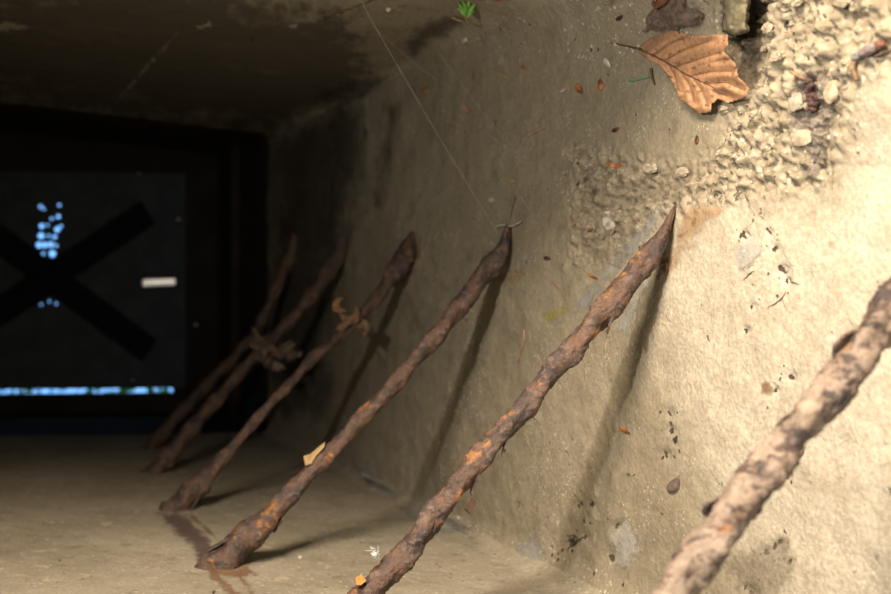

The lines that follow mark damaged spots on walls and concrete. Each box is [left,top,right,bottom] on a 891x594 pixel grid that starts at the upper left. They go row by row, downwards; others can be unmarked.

spalling [832,0,851,9]
spalling [718,0,844,182]
water stain [0,0,365,413]
corrosion [831,329,856,358]
corrosion [701,494,722,517]
corrosion [164,512,256,594]